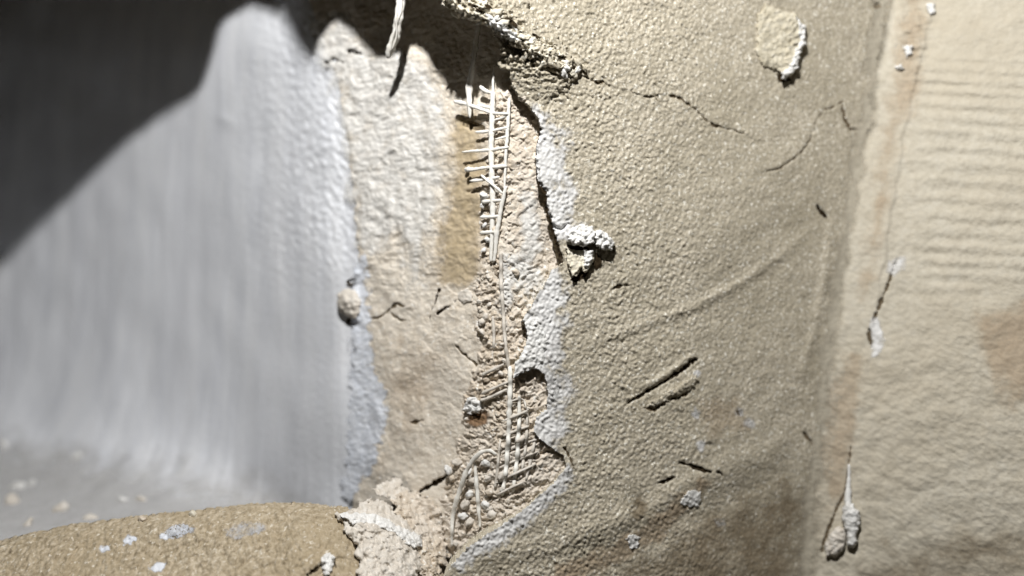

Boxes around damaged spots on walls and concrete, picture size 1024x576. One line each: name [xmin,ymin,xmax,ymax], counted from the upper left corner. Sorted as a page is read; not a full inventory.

crack [631,91,745,134]
crack [767,101,844,171]
spalling [438,66,615,561]
crack [867,273,892,347]
peeling [339,254,389,503]
crack [646,392,689,412]
crack [659,462,723,484]
crack [820,446,851,552]